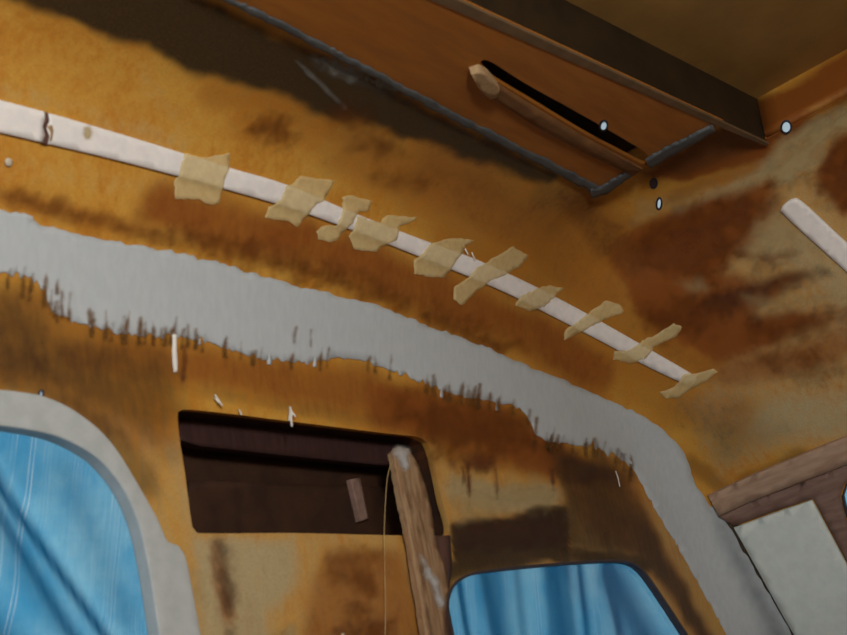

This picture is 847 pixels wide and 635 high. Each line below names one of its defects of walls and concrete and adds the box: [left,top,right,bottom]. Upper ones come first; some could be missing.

crack [40,112,54,145]
peeling [395,448,409,470]